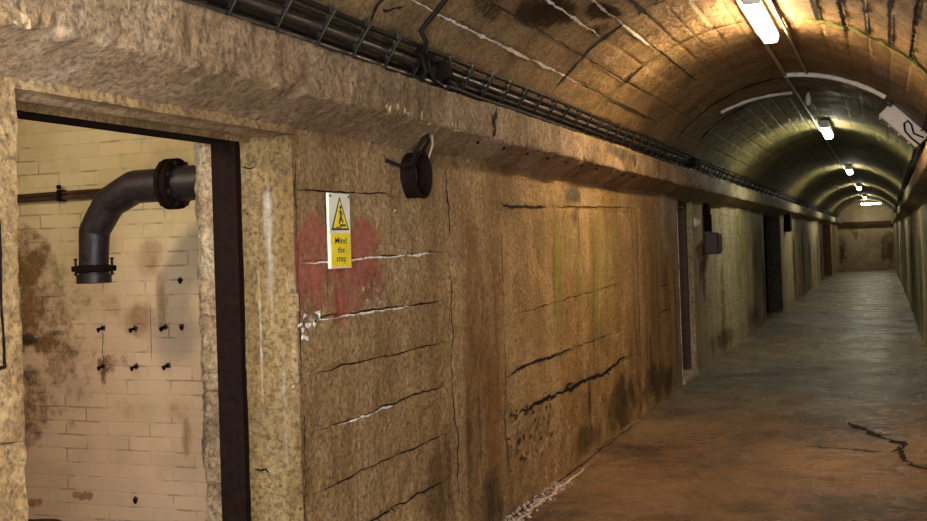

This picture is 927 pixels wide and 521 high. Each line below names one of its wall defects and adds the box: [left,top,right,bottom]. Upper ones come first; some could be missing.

water stain [18,233,78,373]
crack [498,190,670,472]
water stain [23,371,47,436]
crack [811,421,927,469]